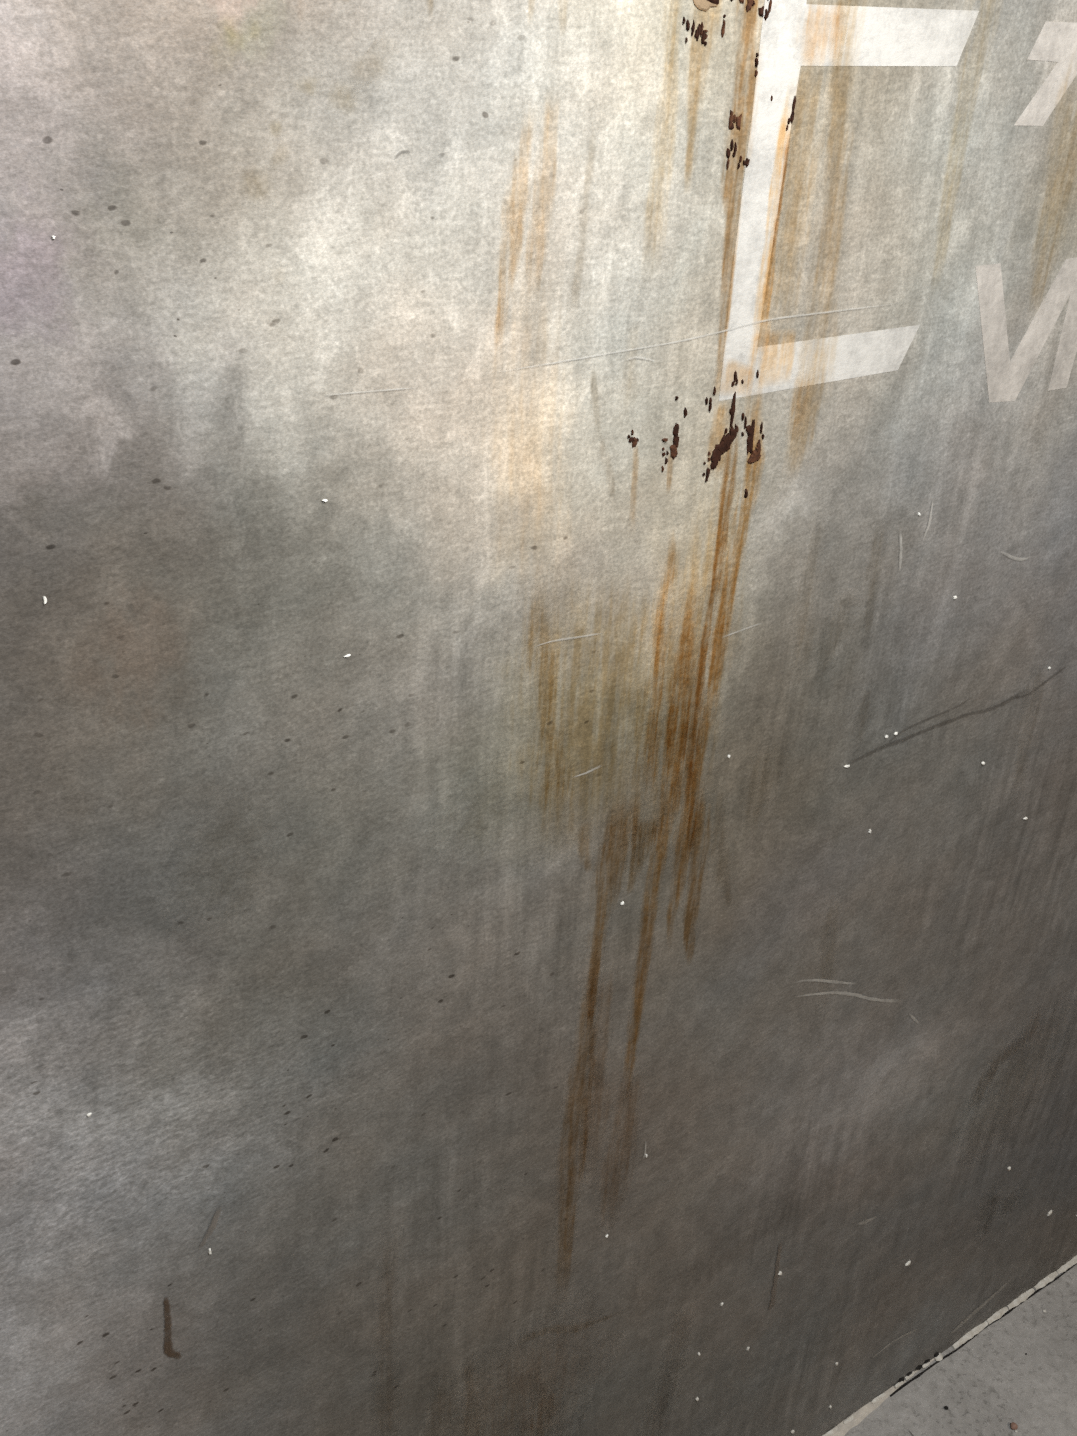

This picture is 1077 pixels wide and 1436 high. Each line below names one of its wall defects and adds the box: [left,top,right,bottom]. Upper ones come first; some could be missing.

spalling [682,0,772,46]